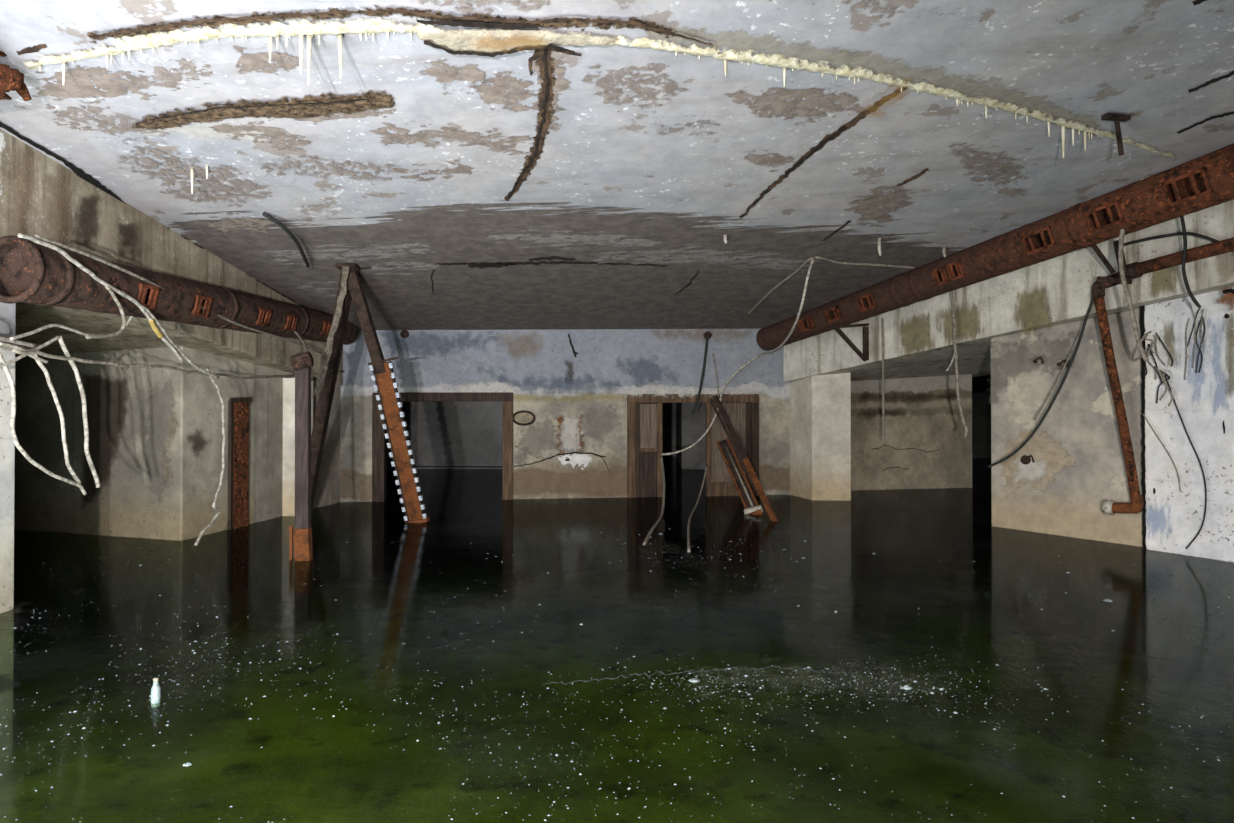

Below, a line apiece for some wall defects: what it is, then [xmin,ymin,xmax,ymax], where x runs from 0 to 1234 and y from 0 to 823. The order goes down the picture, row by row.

crack [0,5,1234,218]
efflorescence [650,28,1099,129]
leakage [168,200,964,330]
crack [823,221,851,241]